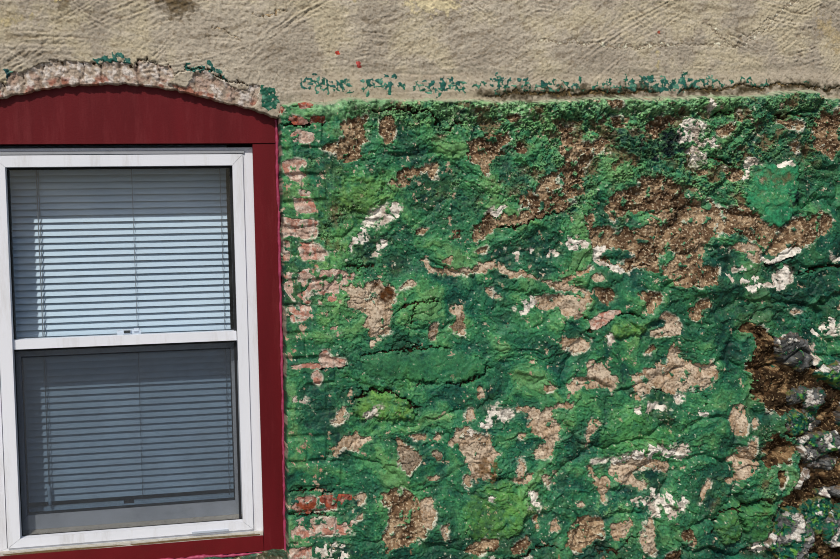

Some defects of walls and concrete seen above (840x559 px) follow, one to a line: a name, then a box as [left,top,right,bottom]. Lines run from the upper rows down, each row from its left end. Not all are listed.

water stain [155,0,194,20]
flaking render [0,60,260,110]
peeling [280,159,417,348]
flaking render [420,123,833,346]
crack [321,298,447,370]
crack [354,380,426,409]
crack [446,366,490,387]
peeling [395,337,620,488]
peeling [631,291,719,415]
flaking render [725,304,840,559]
flaking render [289,493,366,559]
peeling [587,443,691,556]